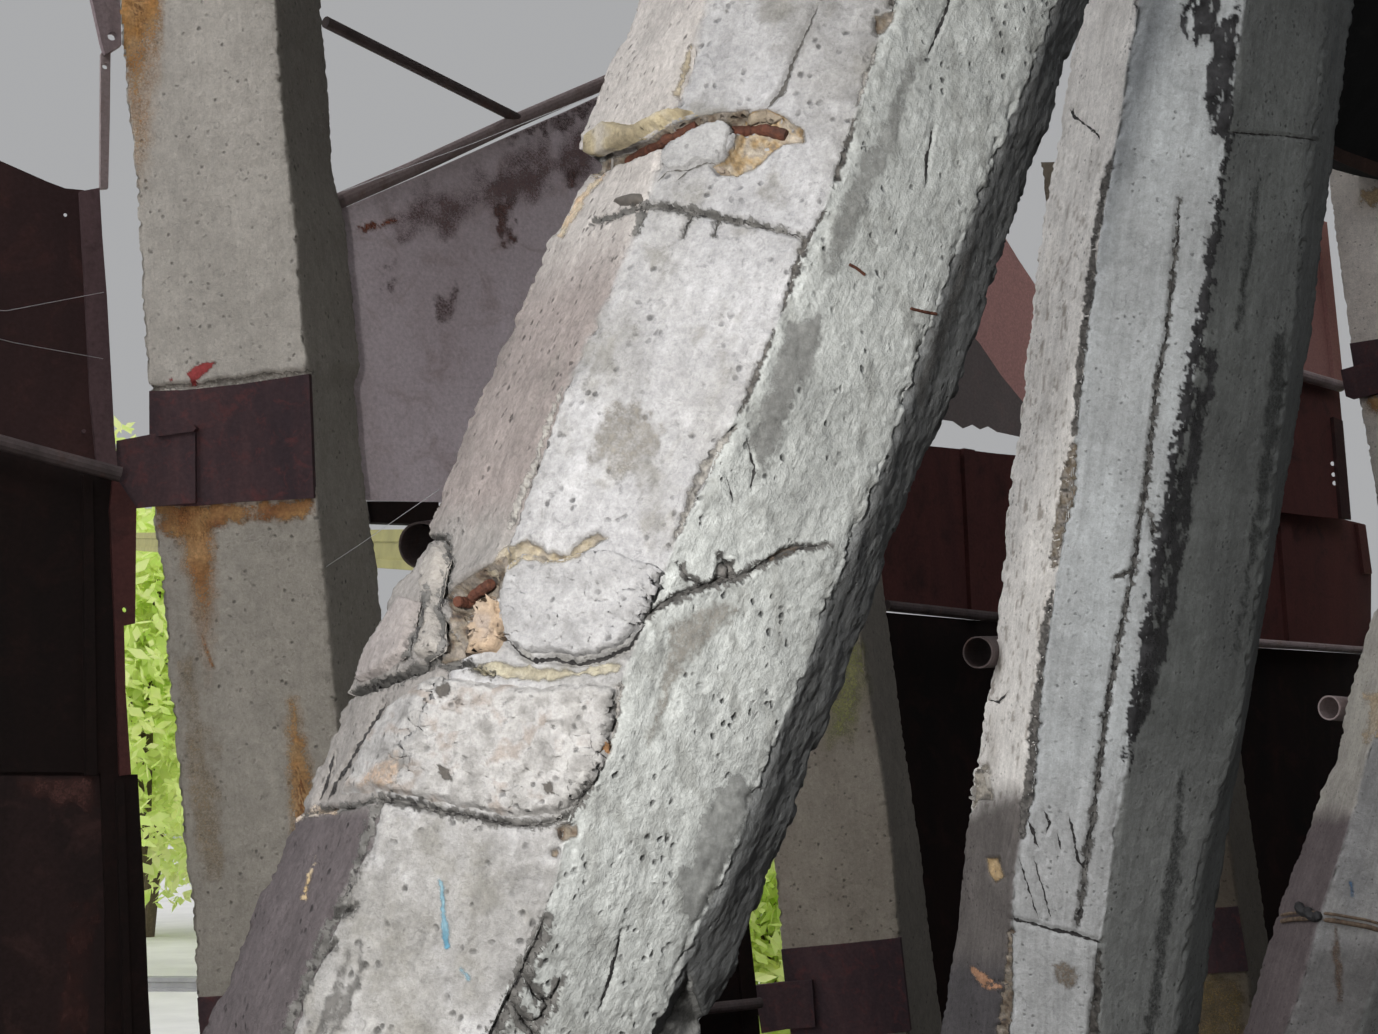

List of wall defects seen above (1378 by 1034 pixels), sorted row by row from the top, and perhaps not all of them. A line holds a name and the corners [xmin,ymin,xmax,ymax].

corrosion [120,0,162,135]
spalling [583,46,804,178]
crack [588,162,805,240]
damp [1180,0,1241,47]
corrosion [156,498,314,626]
spalling [354,386,665,754]
crack [1009,197,1182,943]
damp [1136,348,1218,730]
damp [1237,333,1285,635]
corrosion [287,700,312,831]
crack [280,533,833,1034]
damp [1144,775,1184,1034]